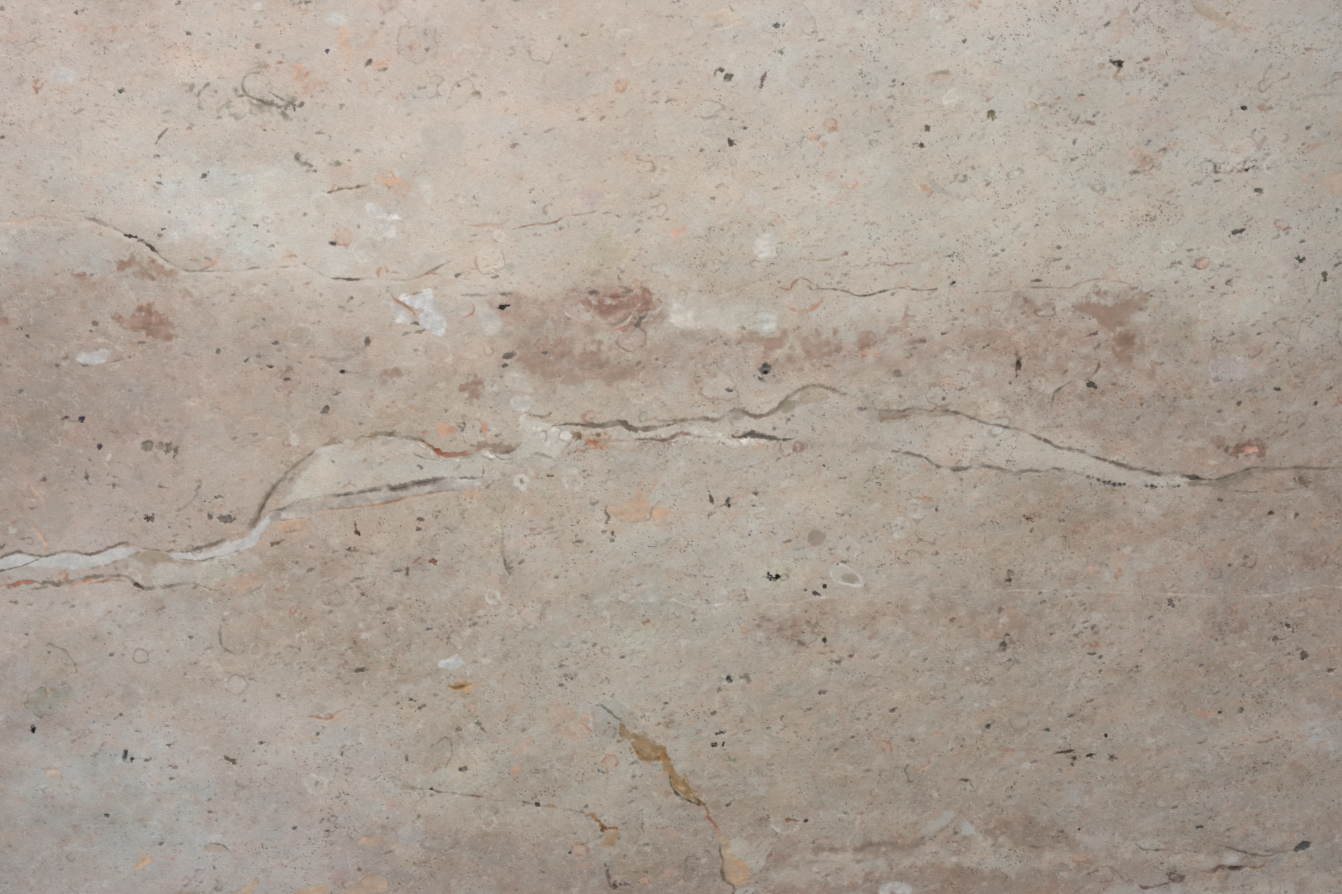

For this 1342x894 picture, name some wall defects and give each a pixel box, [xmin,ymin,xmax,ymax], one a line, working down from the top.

crack [0,357,1342,636]